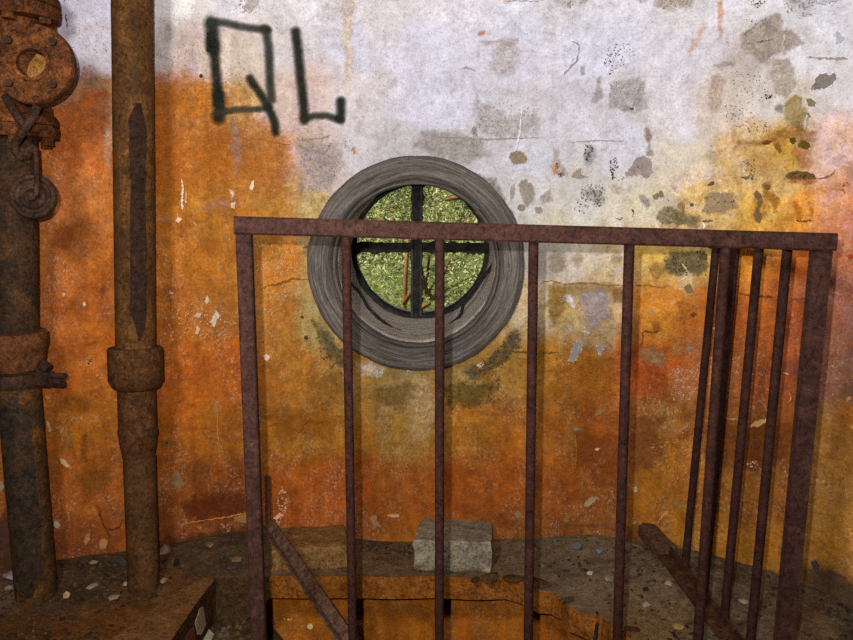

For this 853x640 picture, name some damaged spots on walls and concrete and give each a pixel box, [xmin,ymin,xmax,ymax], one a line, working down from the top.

corrosion [49,18,109,153]
peeling [608,80,647,113]
peeling [742,14,838,127]
spalling [509,150,529,165]
spalling [609,128,655,194]
spalling [639,181,739,215]
corrosion [753,183,779,223]